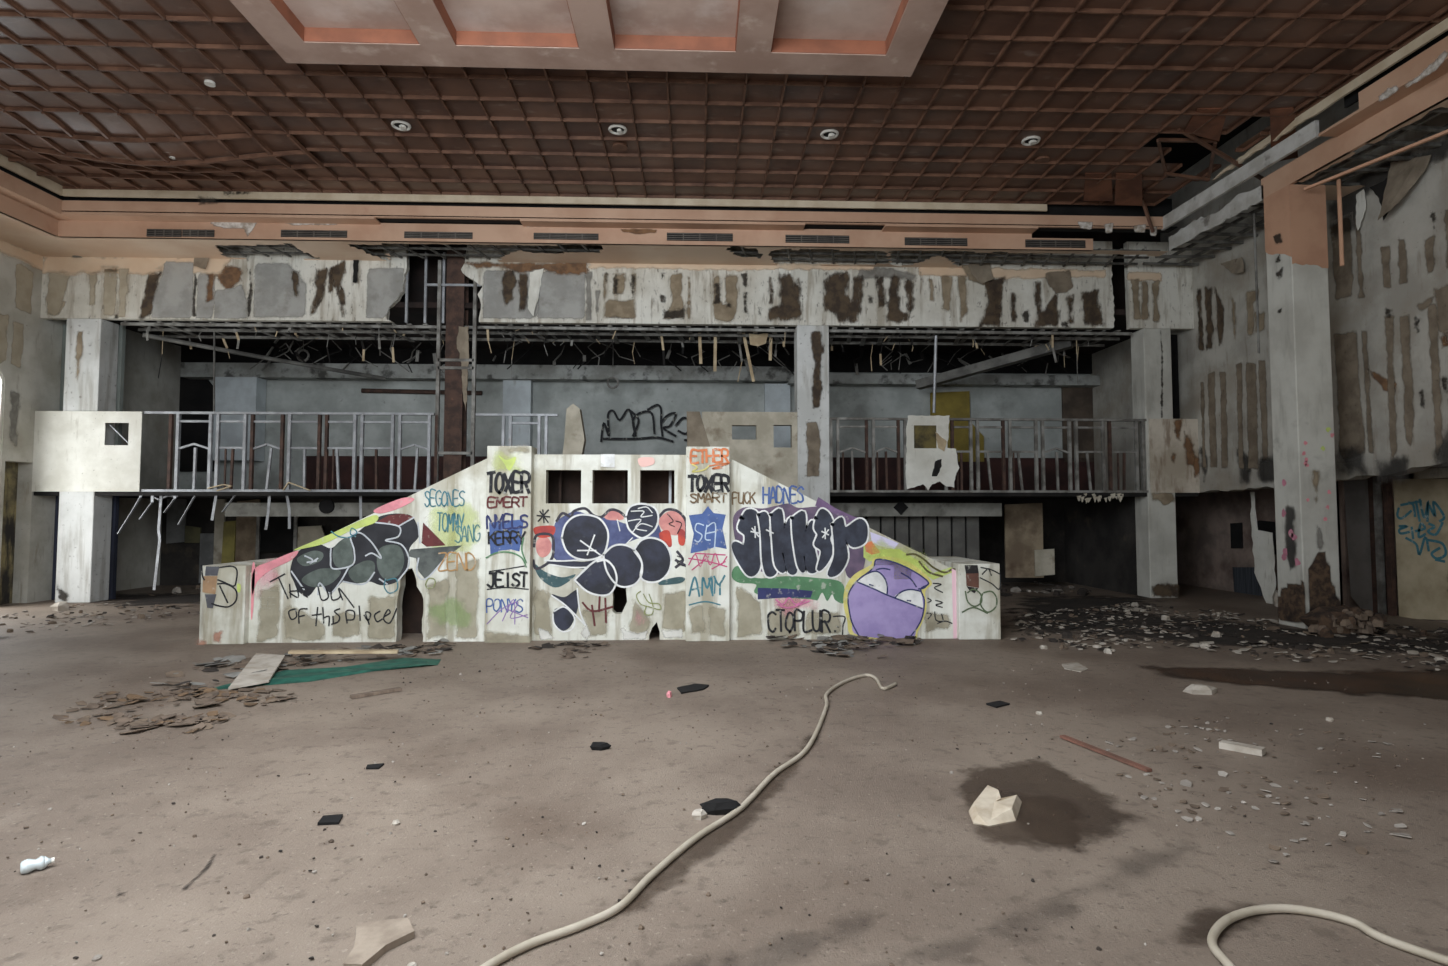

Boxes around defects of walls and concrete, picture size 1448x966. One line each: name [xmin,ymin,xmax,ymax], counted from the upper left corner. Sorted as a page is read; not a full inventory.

peeling [1331,155,1431,299]
peeling [1425,210,1448,272]
peeling [0,264,70,368]
peeling [89,269,129,317]
peeling [152,258,306,319]
peeling [353,245,404,318]
peeling [483,268,585,319]
peeling [1334,285,1448,457]
peeling [1201,360,1268,469]
spalling [1278,552,1345,623]
leakage [961,761,1130,847]